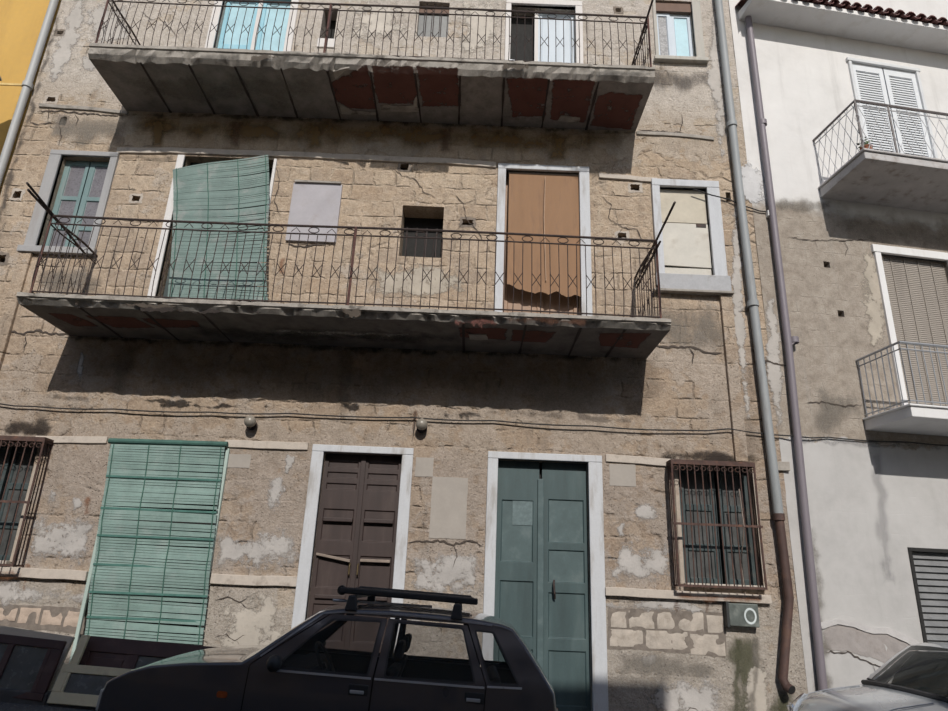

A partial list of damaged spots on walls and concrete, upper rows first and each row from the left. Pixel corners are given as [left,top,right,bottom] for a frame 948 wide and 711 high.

peeling [49,0,134,81]
spalling [332,65,461,115]
spalling [502,63,643,130]
peeling [267,454,295,509]
peeling [31,498,93,565]
peeling [216,530,296,570]
crack [408,539,481,566]
peeling [412,553,481,595]
flaking render [0,578,86,634]
peeling [218,592,284,647]
flaking render [821,619,925,665]
leakage [733,639,758,709]